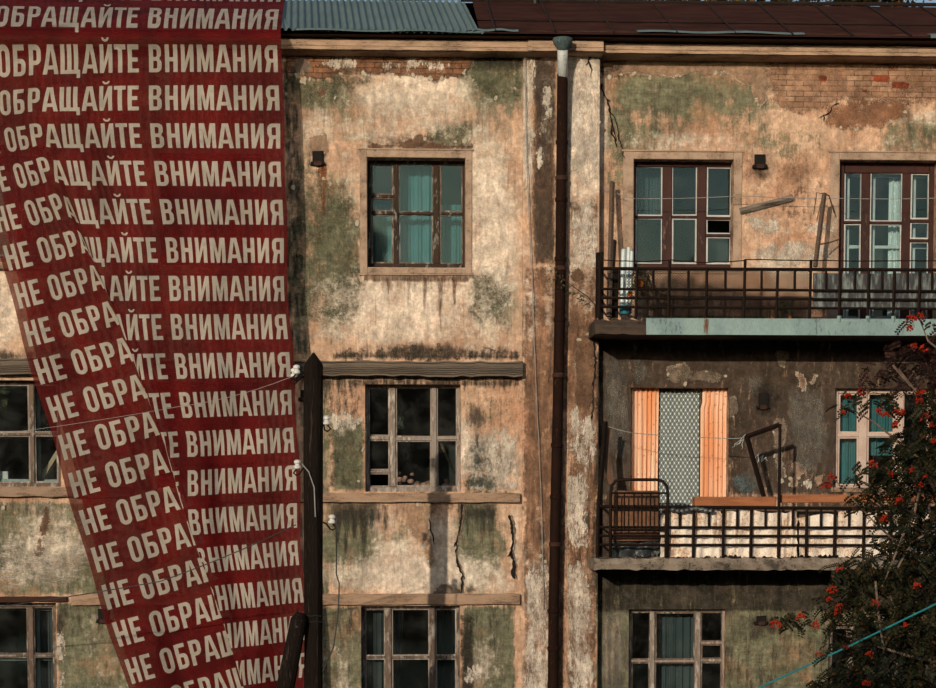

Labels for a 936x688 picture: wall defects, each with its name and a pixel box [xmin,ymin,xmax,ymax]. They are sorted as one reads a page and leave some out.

flaking render [282,56,553,190]
crack [586,57,625,159]
flaking render [569,56,936,187]
leakage [337,342,518,362]
crack [429,503,465,593]
crack [507,515,517,579]